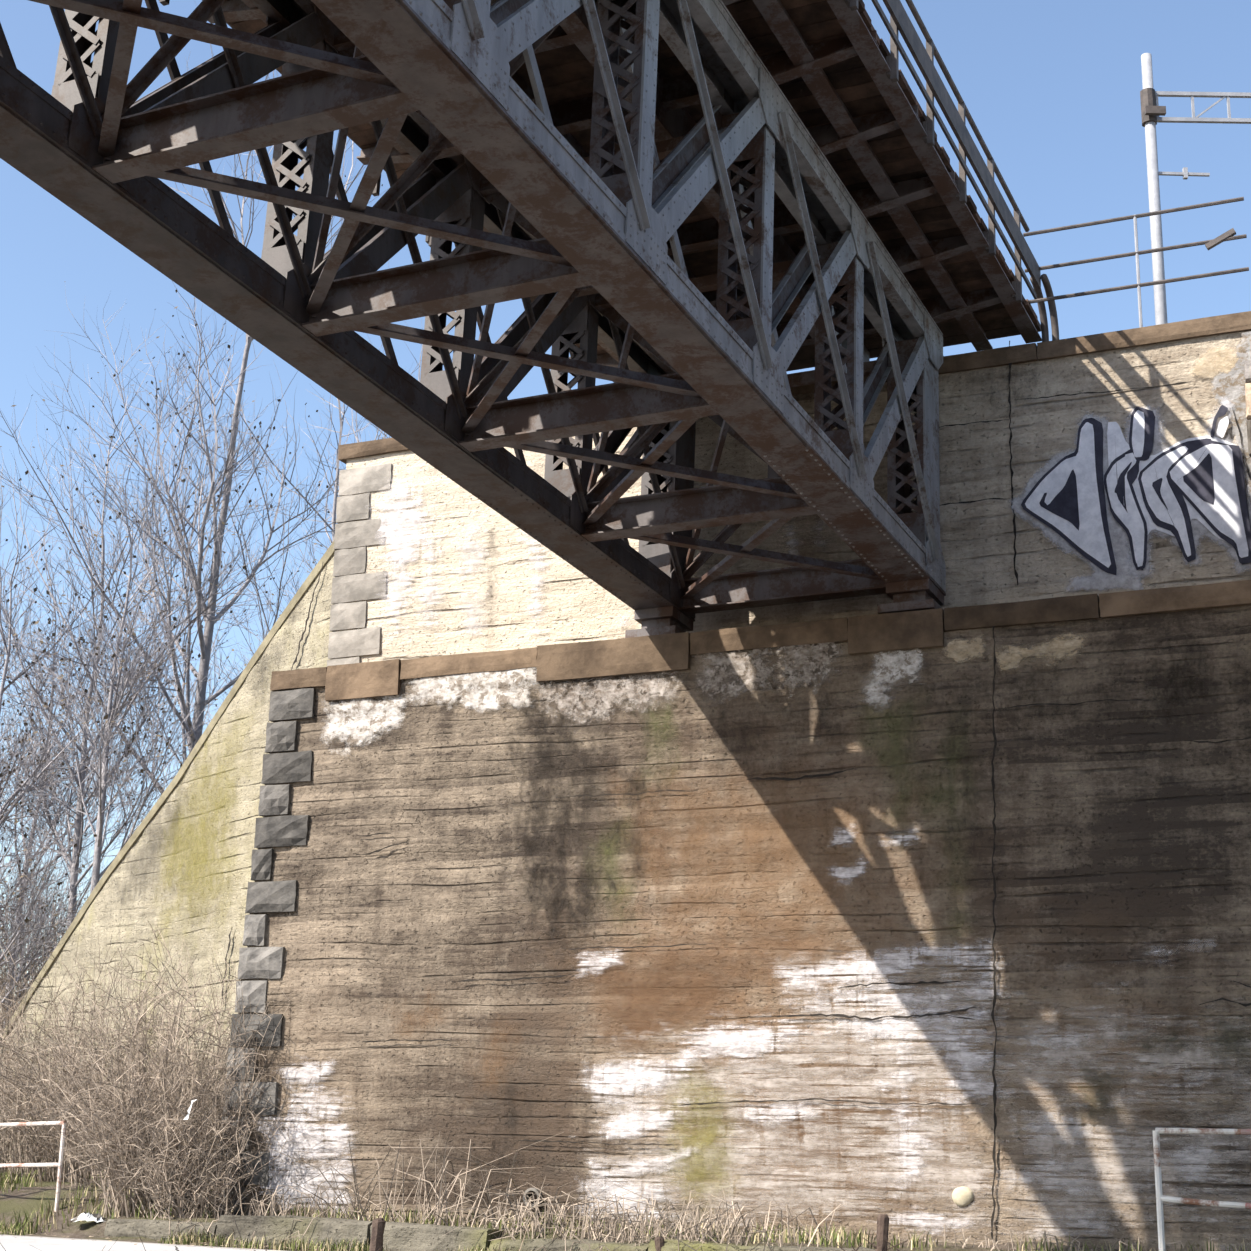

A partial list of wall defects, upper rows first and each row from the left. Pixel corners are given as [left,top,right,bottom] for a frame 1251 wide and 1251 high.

crack [939,341,1193,585]
water stain [579,954,618,971]
water stain [831,862,866,878]
crack [673,626,1142,1245]
water stain [259,1062,351,1208]
water stain [586,947,1000,1220]
water stain [895,1214,984,1225]